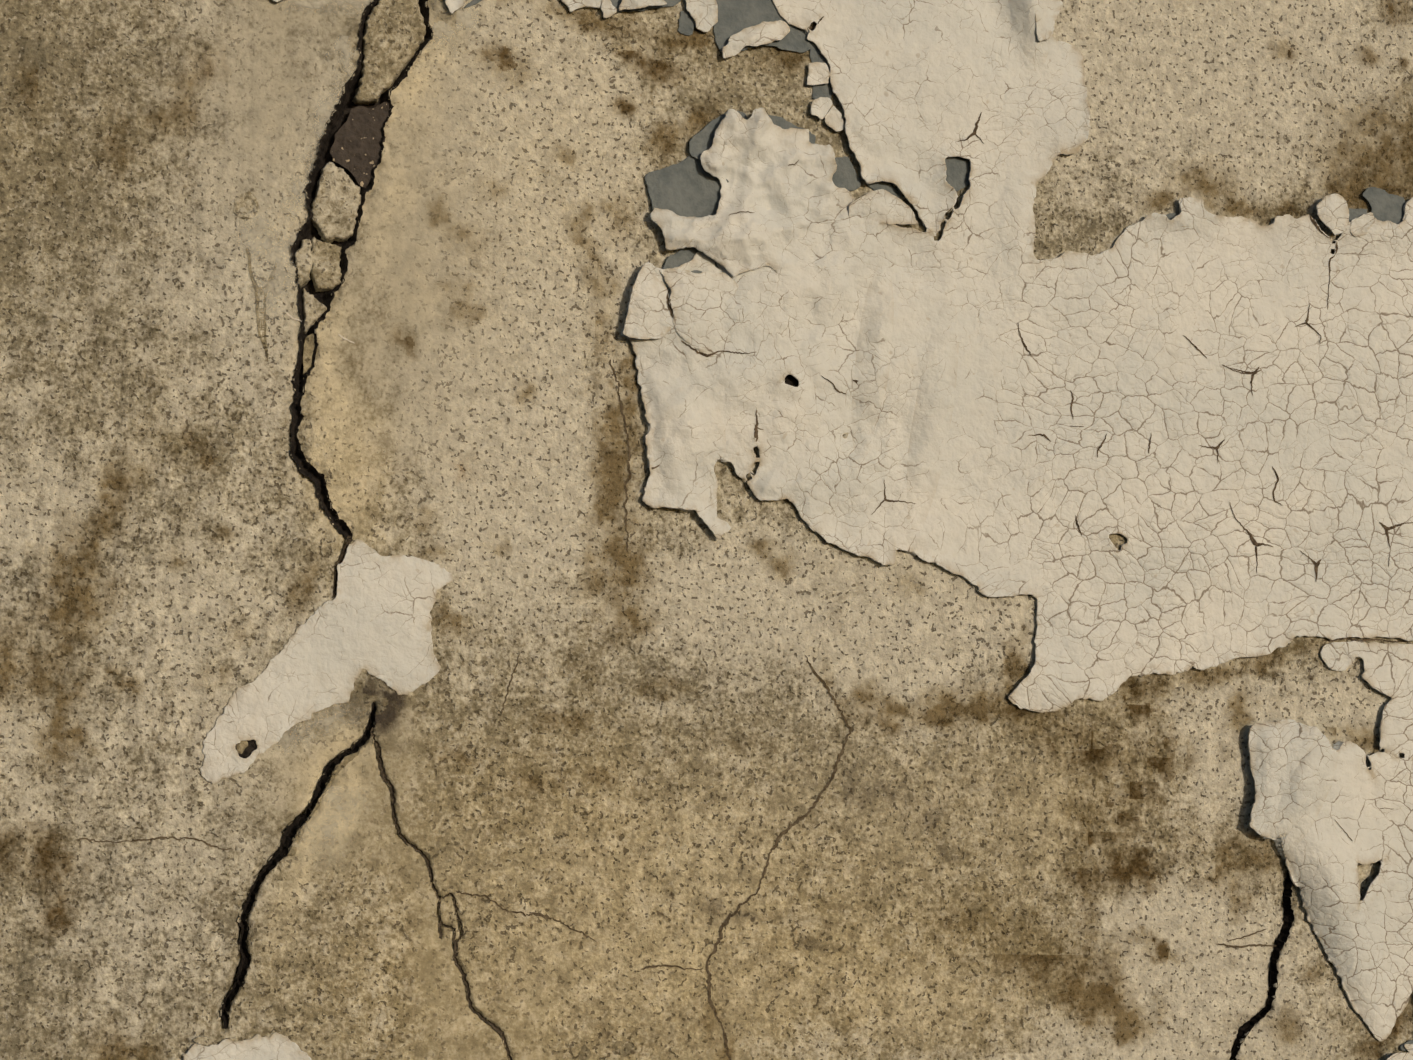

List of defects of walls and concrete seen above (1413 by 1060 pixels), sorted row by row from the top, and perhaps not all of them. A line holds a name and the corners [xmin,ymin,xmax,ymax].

peeling [445,0,482,14]
spalling [246,248,277,365]
crack [290,0,433,597]
peeling [561,0,1413,713]
crack [1183,335,1262,395]
crack [1295,214,1338,340]
crack [1230,504,1322,580]
peeling [200,539,453,785]
crack [220,702,597,1060]
crack [1229,873,1294,1060]
peeling [183,1032,312,1060]
peeling [1386,1040,1413,1060]